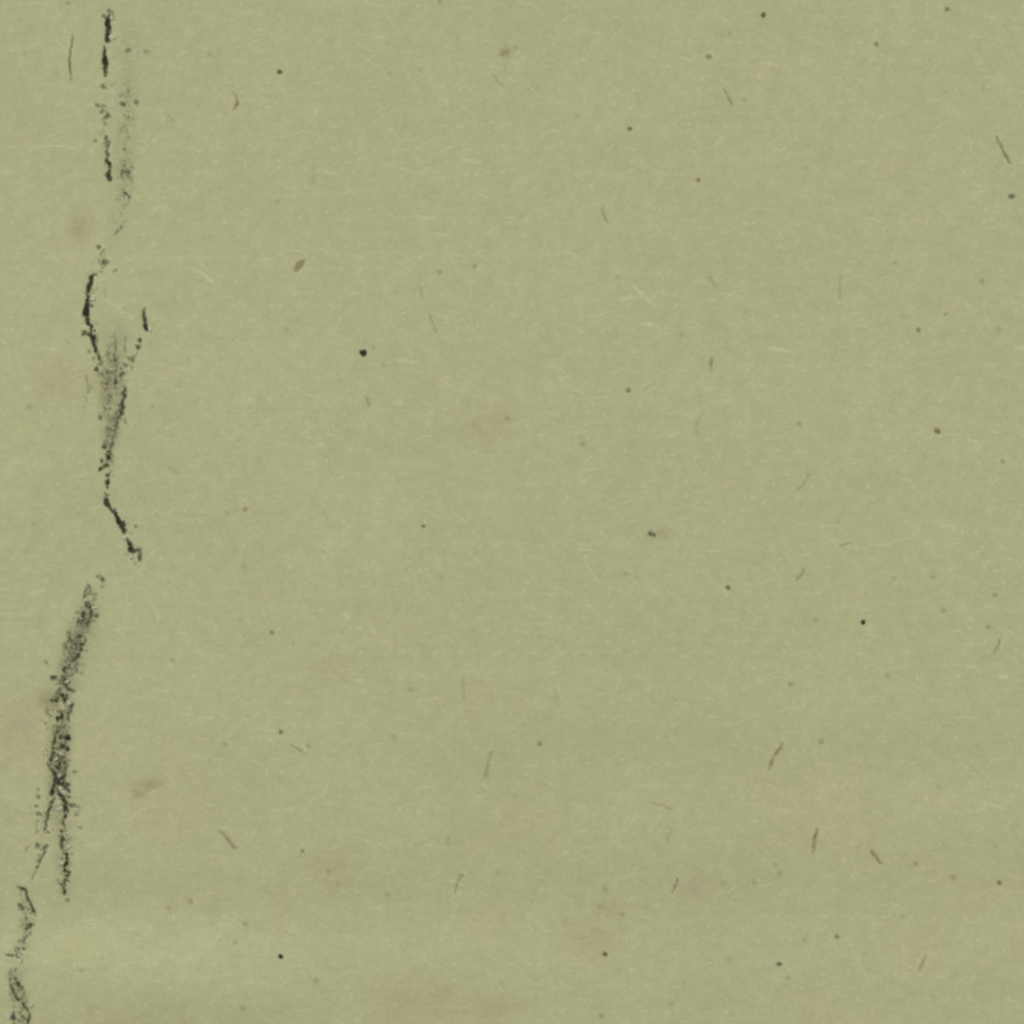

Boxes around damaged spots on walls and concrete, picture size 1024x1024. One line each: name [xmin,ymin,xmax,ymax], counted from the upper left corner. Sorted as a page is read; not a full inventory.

crack [102,16,115,73]
crack [106,136,126,193]
crack [83,275,125,414]
crack [139,313,151,341]
crack [99,446,139,558]
crack [44,599,97,893]